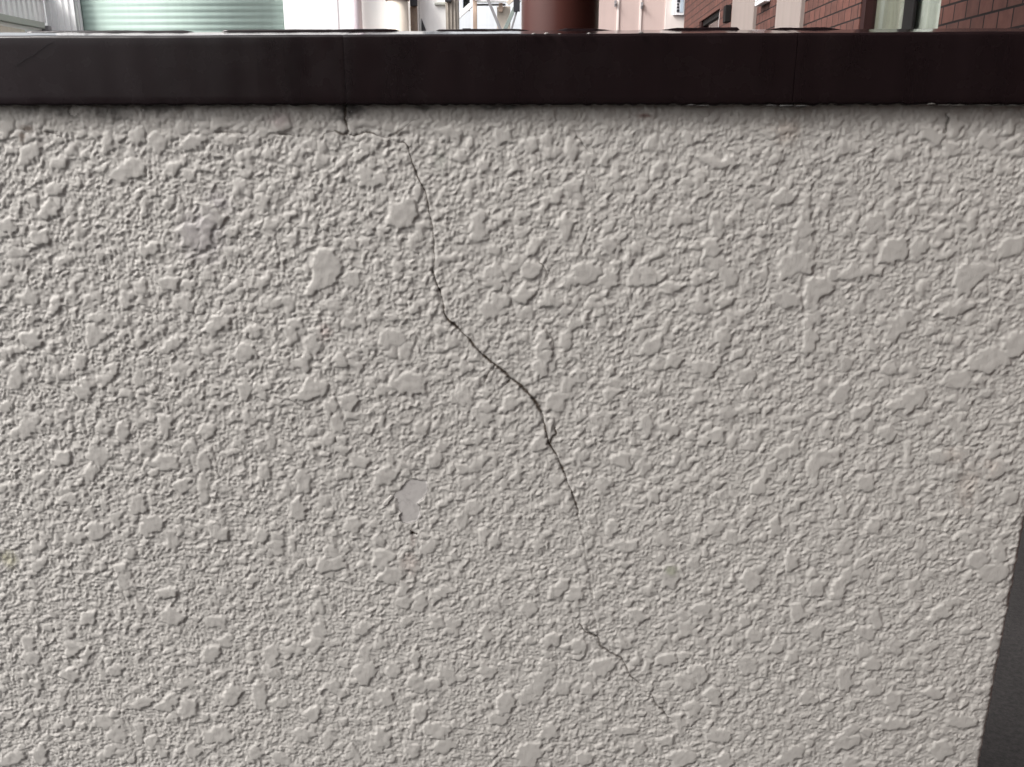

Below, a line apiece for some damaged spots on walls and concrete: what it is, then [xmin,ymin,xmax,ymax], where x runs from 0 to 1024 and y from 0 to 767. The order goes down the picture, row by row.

crack [324,105,578,510]